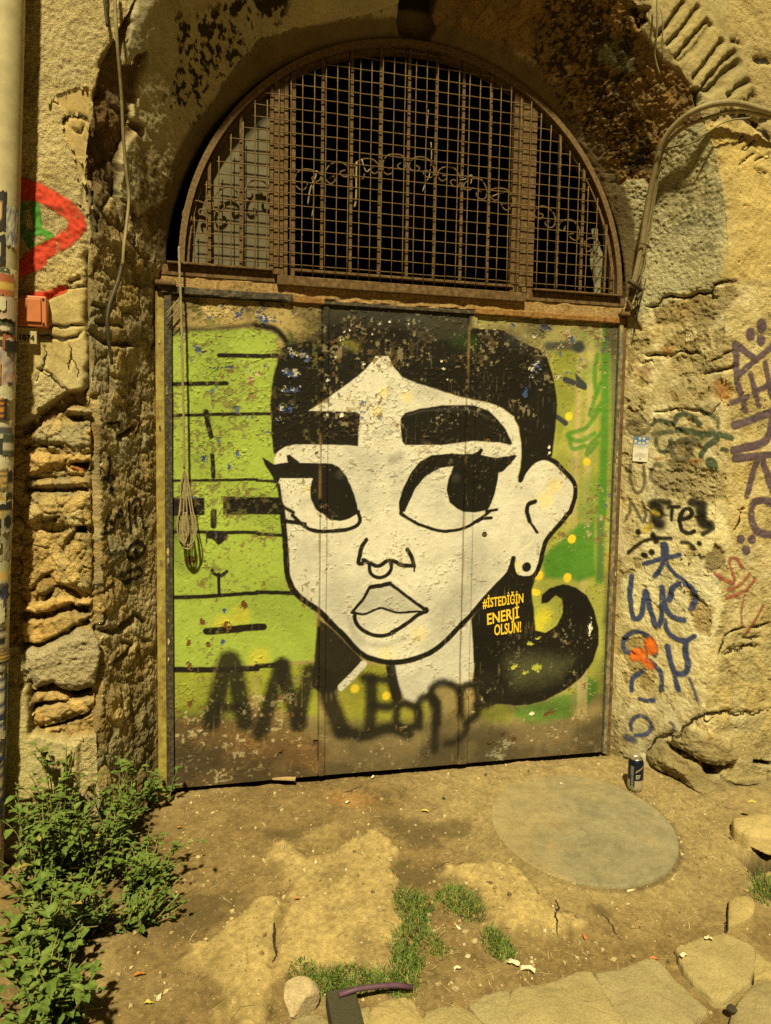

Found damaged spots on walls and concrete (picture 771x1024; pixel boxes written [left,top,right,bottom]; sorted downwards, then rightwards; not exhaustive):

flaking render [48,3,146,215]
damp [171,0,288,124]
damp [532,0,652,175]
crack [649,280,734,308]